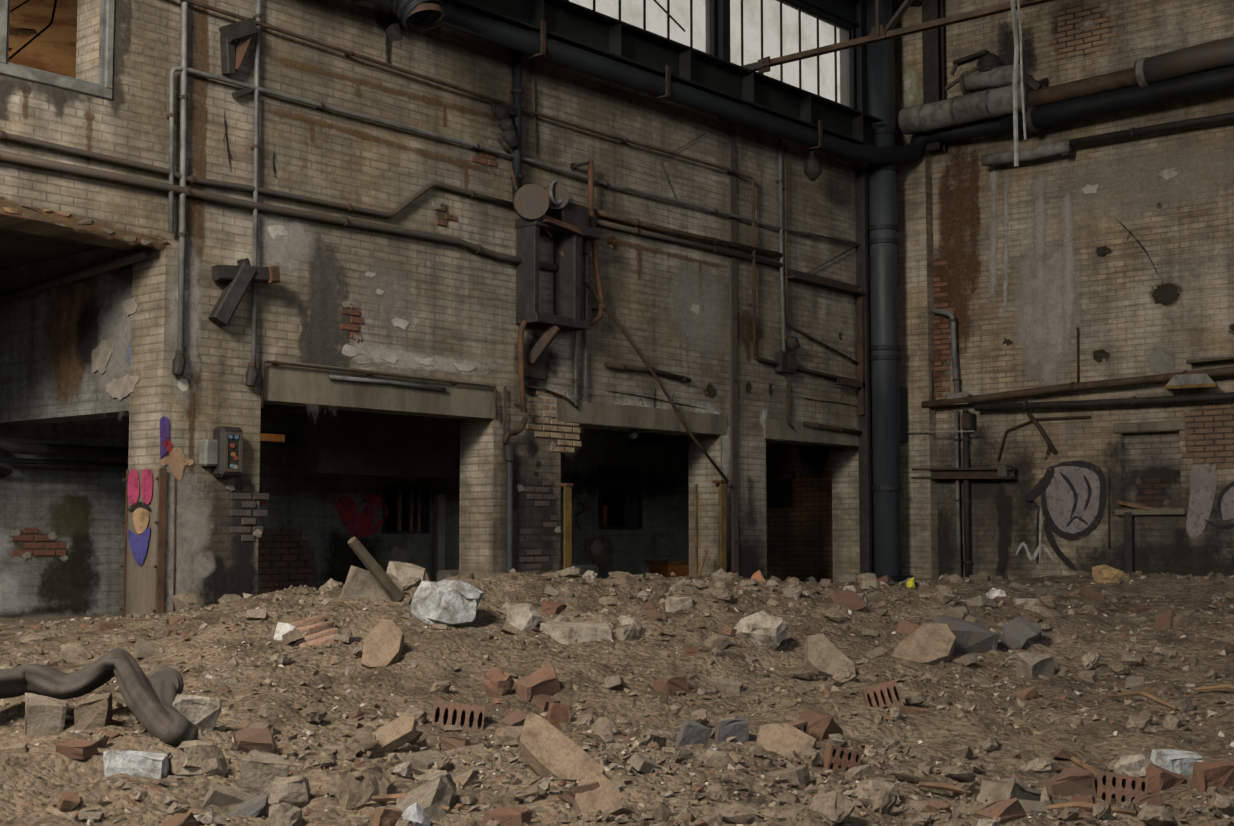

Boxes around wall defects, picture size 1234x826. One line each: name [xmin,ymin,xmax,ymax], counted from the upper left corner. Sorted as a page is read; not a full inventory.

damp [0,74,91,119]
spalling [0,196,170,248]
corrosion [185,0,209,471]
peeling [258,213,312,270]
flaking render [76,265,140,411]
peeling [167,249,203,408]
peeling [338,301,501,377]
flaking render [933,261,956,397]
flaking render [519,384,582,456]
flaking render [1182,403,1234,469]
flaking render [9,528,69,562]
damp [0,495,99,617]